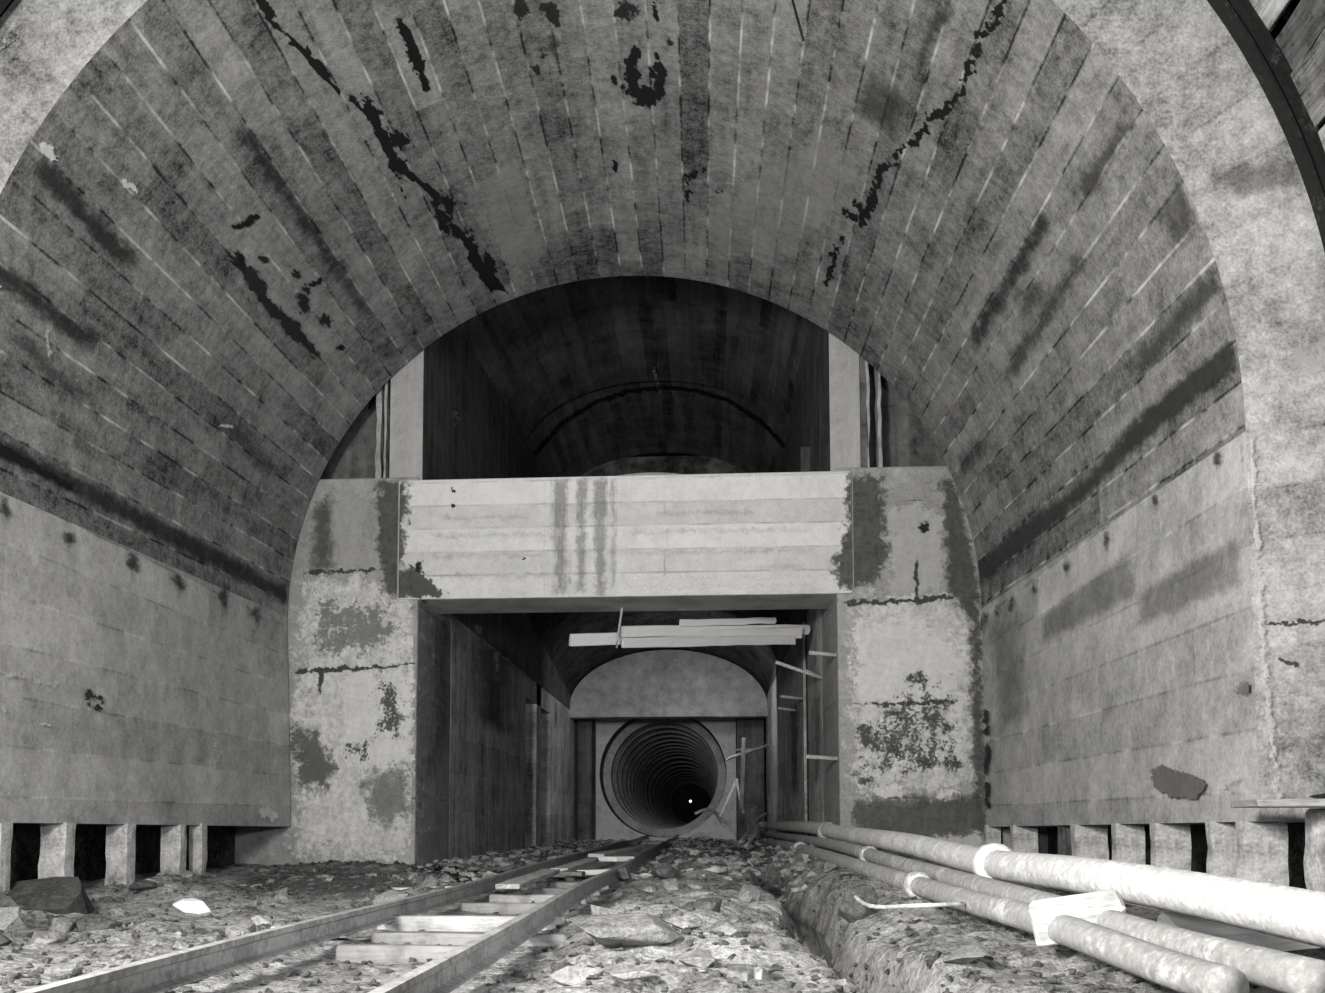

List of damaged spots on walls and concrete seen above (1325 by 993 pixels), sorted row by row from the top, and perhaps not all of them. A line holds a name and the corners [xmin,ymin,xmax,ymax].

spalling [612,0,659,22]
spalling [396,18,431,93]
spalling [610,38,673,109]
crack [256,0,508,294]
crack [823,0,1007,294]
leakage [554,482,565,588]
leakage [852,341,1233,847]
crack [295,663,415,693]
leakage [289,726,339,794]